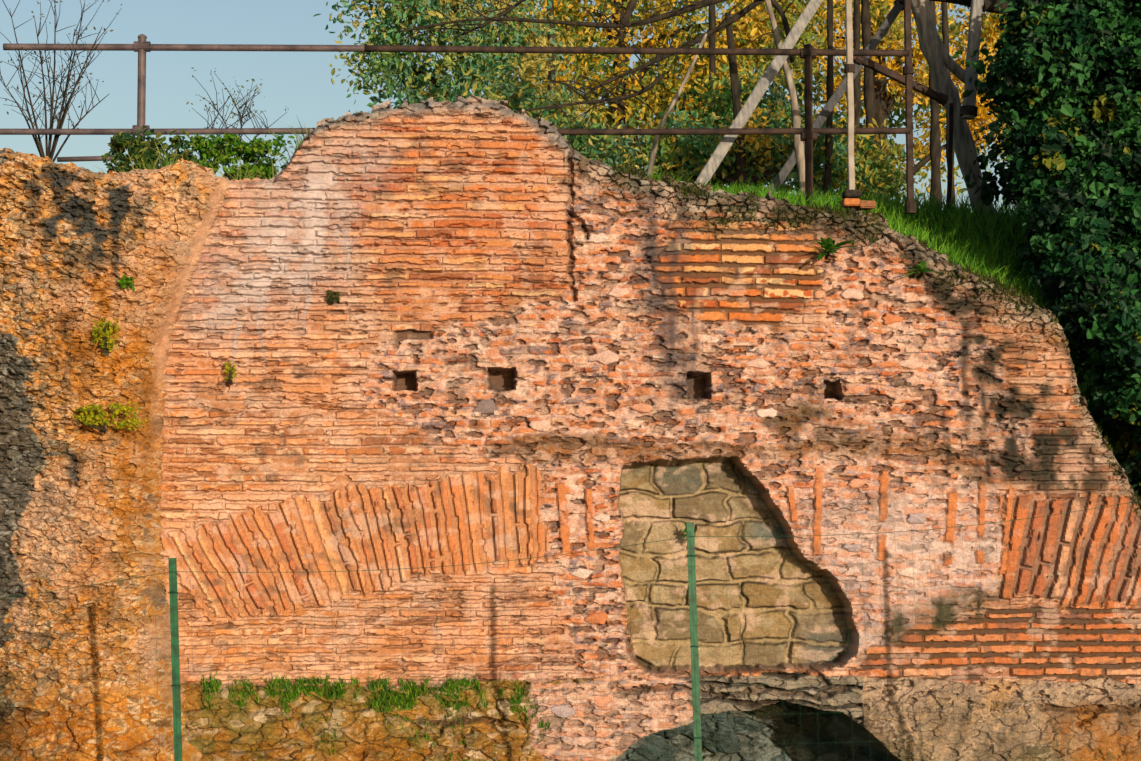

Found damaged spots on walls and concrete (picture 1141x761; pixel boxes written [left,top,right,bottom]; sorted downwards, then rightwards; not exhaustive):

crack [566,146,589,302]
spalling [361,169,1039,761]